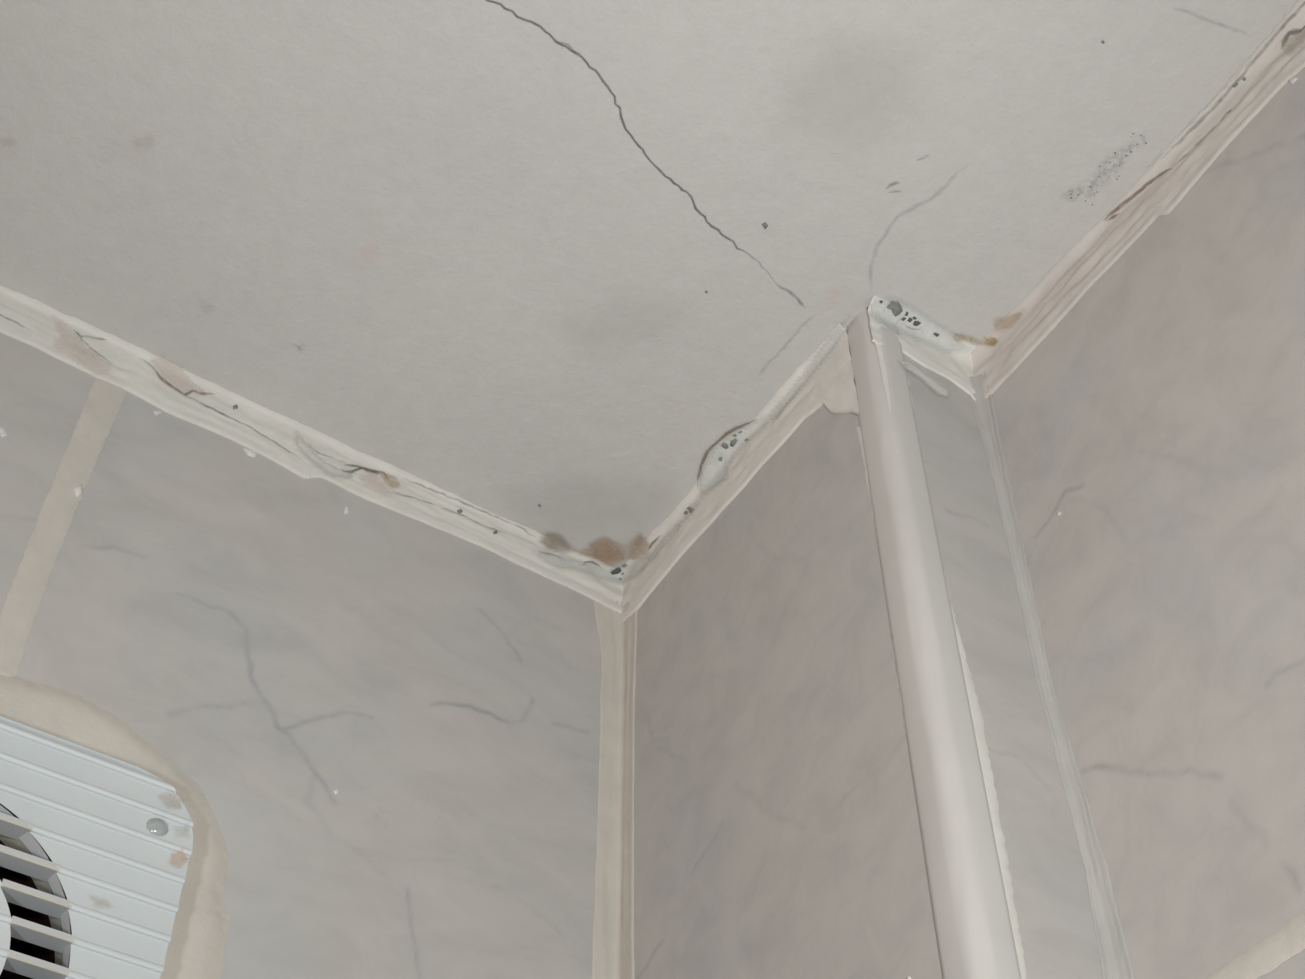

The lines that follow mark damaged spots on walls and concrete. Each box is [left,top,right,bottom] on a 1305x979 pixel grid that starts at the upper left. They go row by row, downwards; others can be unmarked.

crack [486,0,740,250]
peeling [298,437,395,487]
spalling [697,318,854,494]
spalling [871,300,962,351]